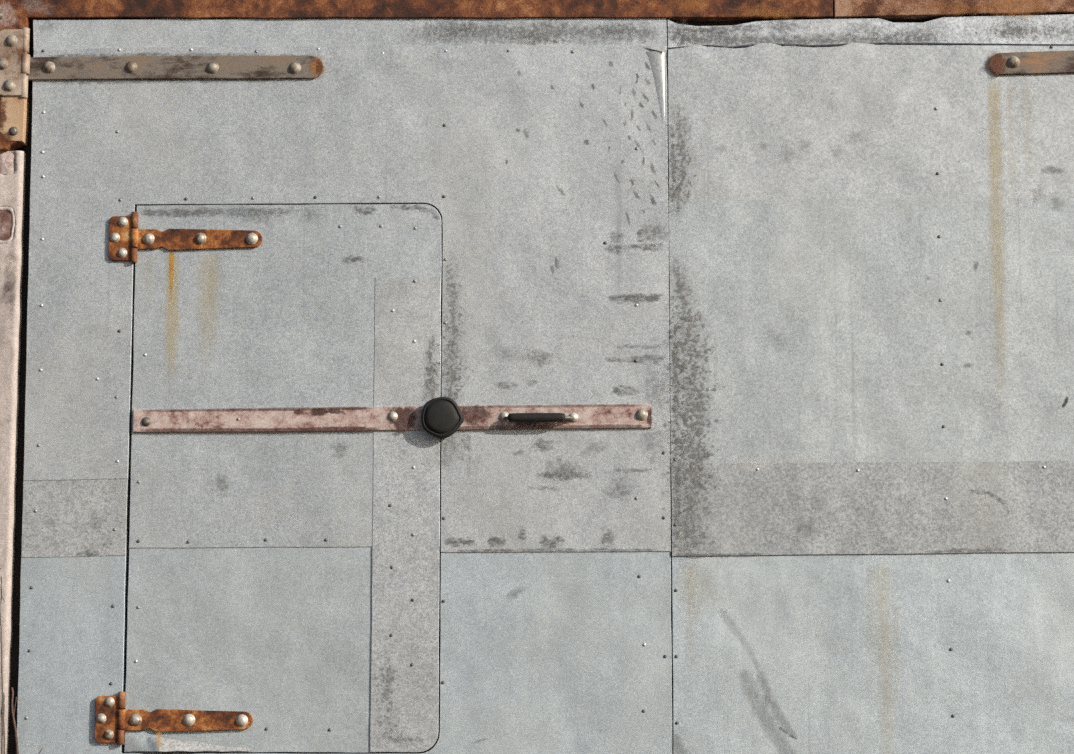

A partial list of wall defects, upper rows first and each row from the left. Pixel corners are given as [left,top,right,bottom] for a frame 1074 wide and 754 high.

rust [0,2,16,26]
rust [673,9,928,48]